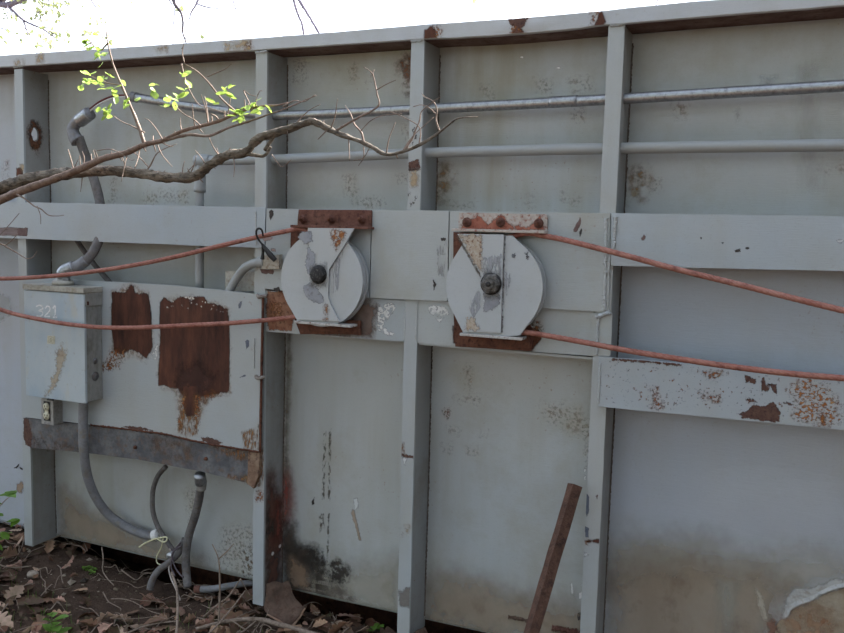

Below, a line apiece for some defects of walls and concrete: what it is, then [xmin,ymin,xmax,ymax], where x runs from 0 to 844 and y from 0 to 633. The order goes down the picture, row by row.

rust [424,26,442,38]
rust [508,17,528,33]
rust [26,120,43,149]
peeling [298,231,324,304]
rust [459,214,544,270]
rust [606,358,682,388]
rust [694,370,840,426]
rust [23,418,39,448]
rust [102,285,294,596]
damp [282,523,393,605]
peeling [756,579,844,633]